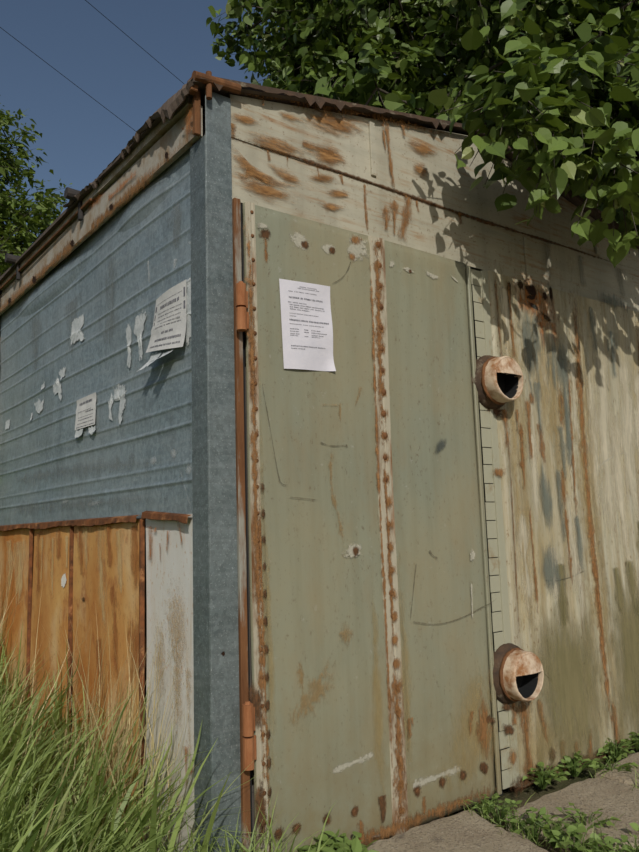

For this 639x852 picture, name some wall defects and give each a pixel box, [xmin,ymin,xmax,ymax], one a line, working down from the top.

corrosion [0,151,175,311]
corrosion [245,233,283,852]
corrosion [351,241,489,845]
corrosion [231,93,611,262]
corrosion [495,281,556,356]
corrosion [469,316,633,797]